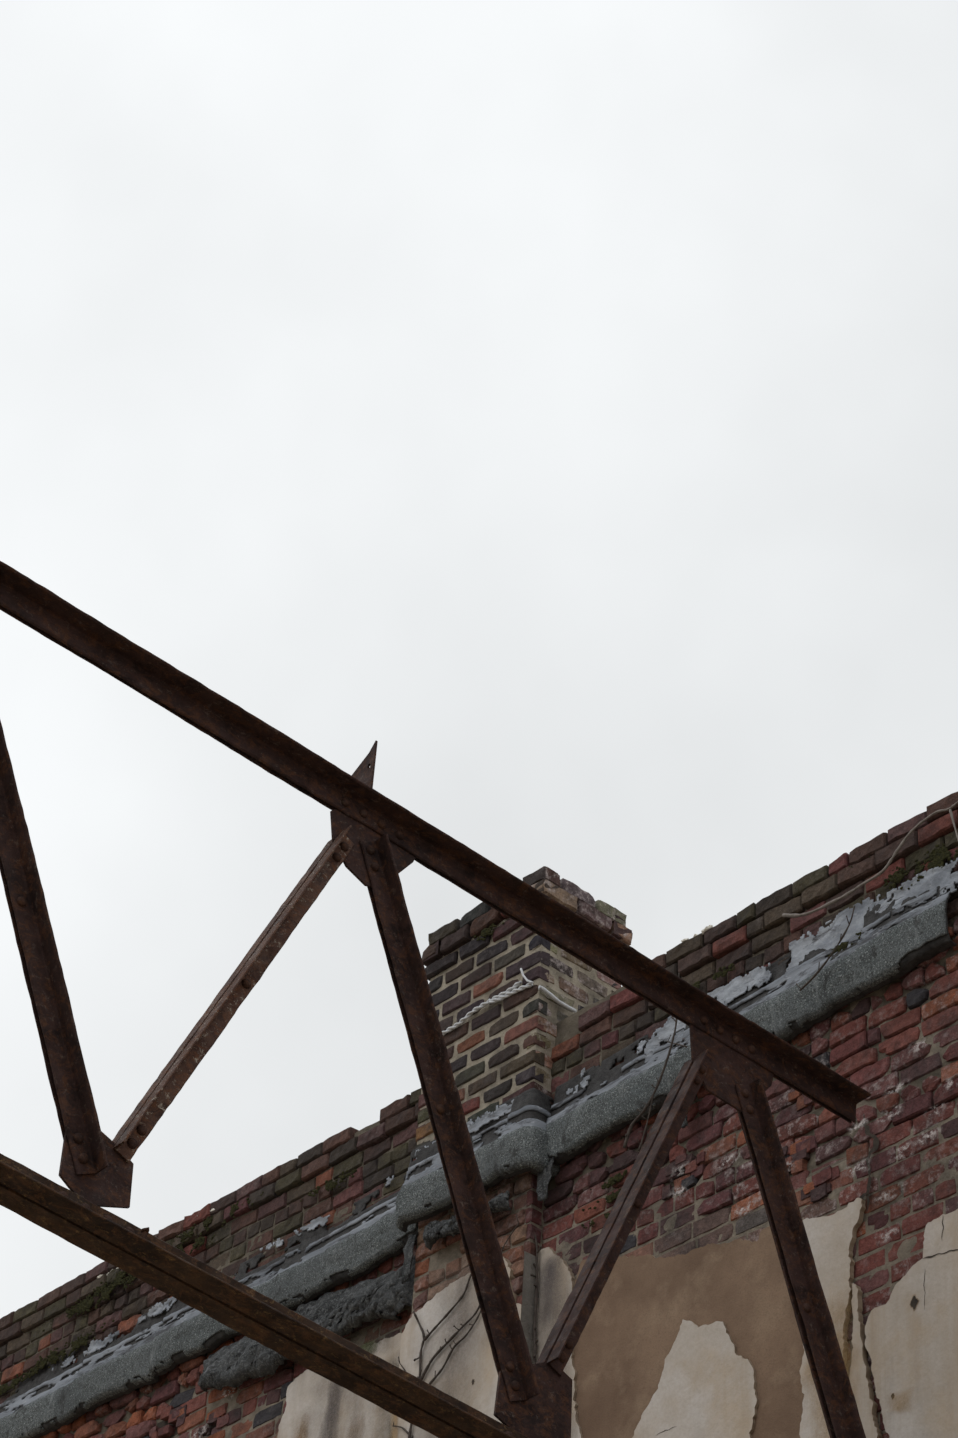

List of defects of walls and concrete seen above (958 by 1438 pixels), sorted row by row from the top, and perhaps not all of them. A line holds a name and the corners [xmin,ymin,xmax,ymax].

peeling [260,1215,330,1251]
peeling [138,1297,177,1324]
flaking render [573,1226,804,1438]
peeling [52,1330,120,1371]
spalling [149,1403,229,1438]